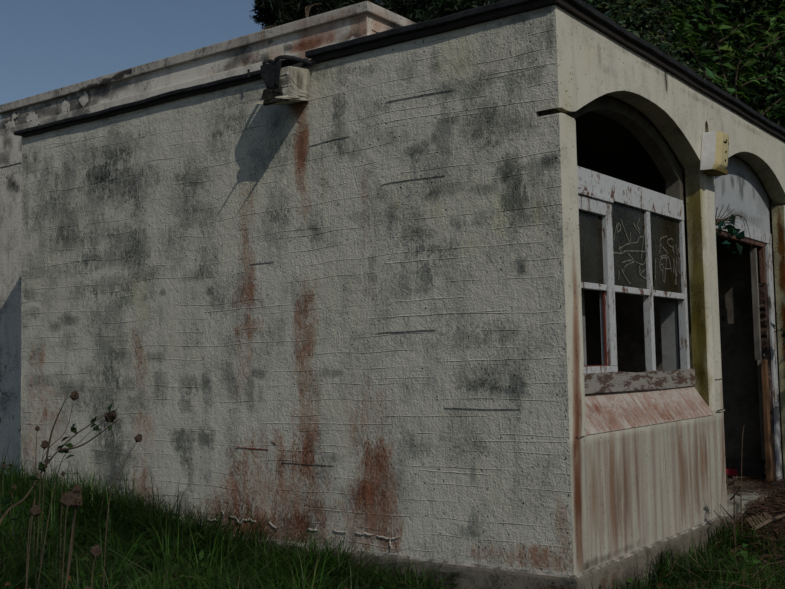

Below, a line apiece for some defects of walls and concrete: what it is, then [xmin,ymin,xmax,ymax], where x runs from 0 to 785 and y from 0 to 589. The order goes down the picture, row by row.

peeling [5,111,41,128]